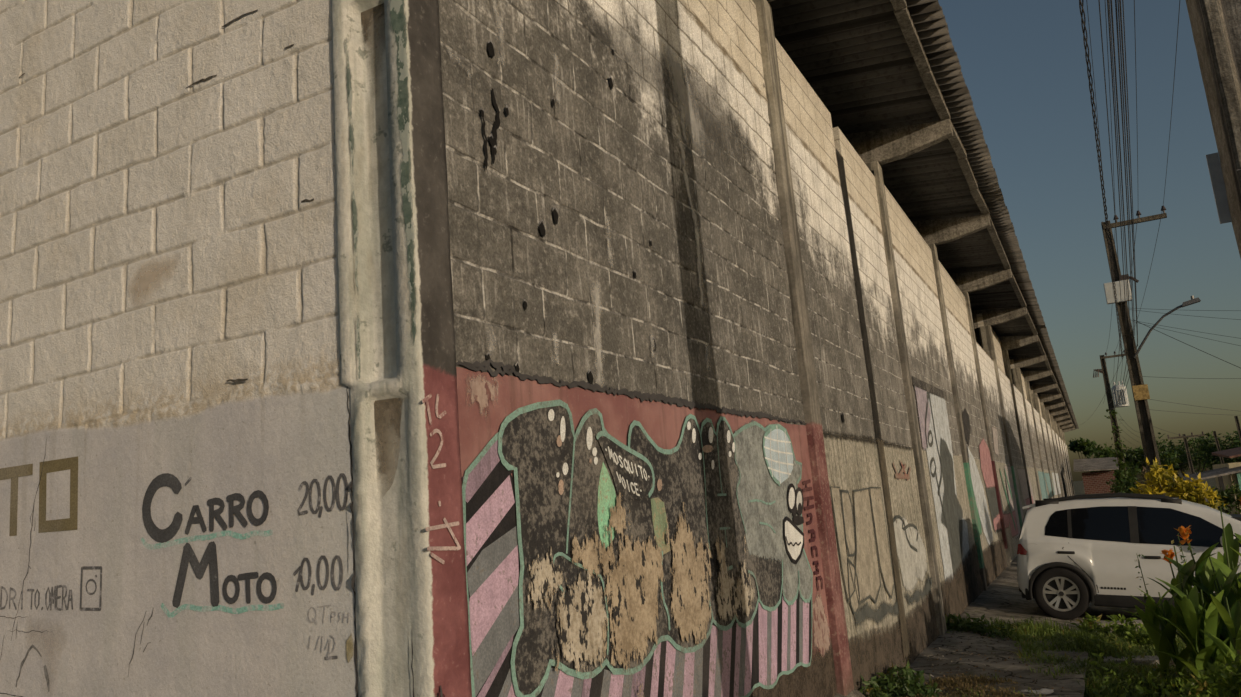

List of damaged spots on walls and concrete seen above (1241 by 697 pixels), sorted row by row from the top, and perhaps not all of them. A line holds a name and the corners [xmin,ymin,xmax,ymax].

peeling [344,40,354,168]
peeling [390,0,417,341]
leakage [483,88,500,170]
leakage [607,36,748,304]
leakage [823,149,1007,697]
crack [0,439,47,659]
peeling [527,492,755,697]
leakage [749,644,837,697]